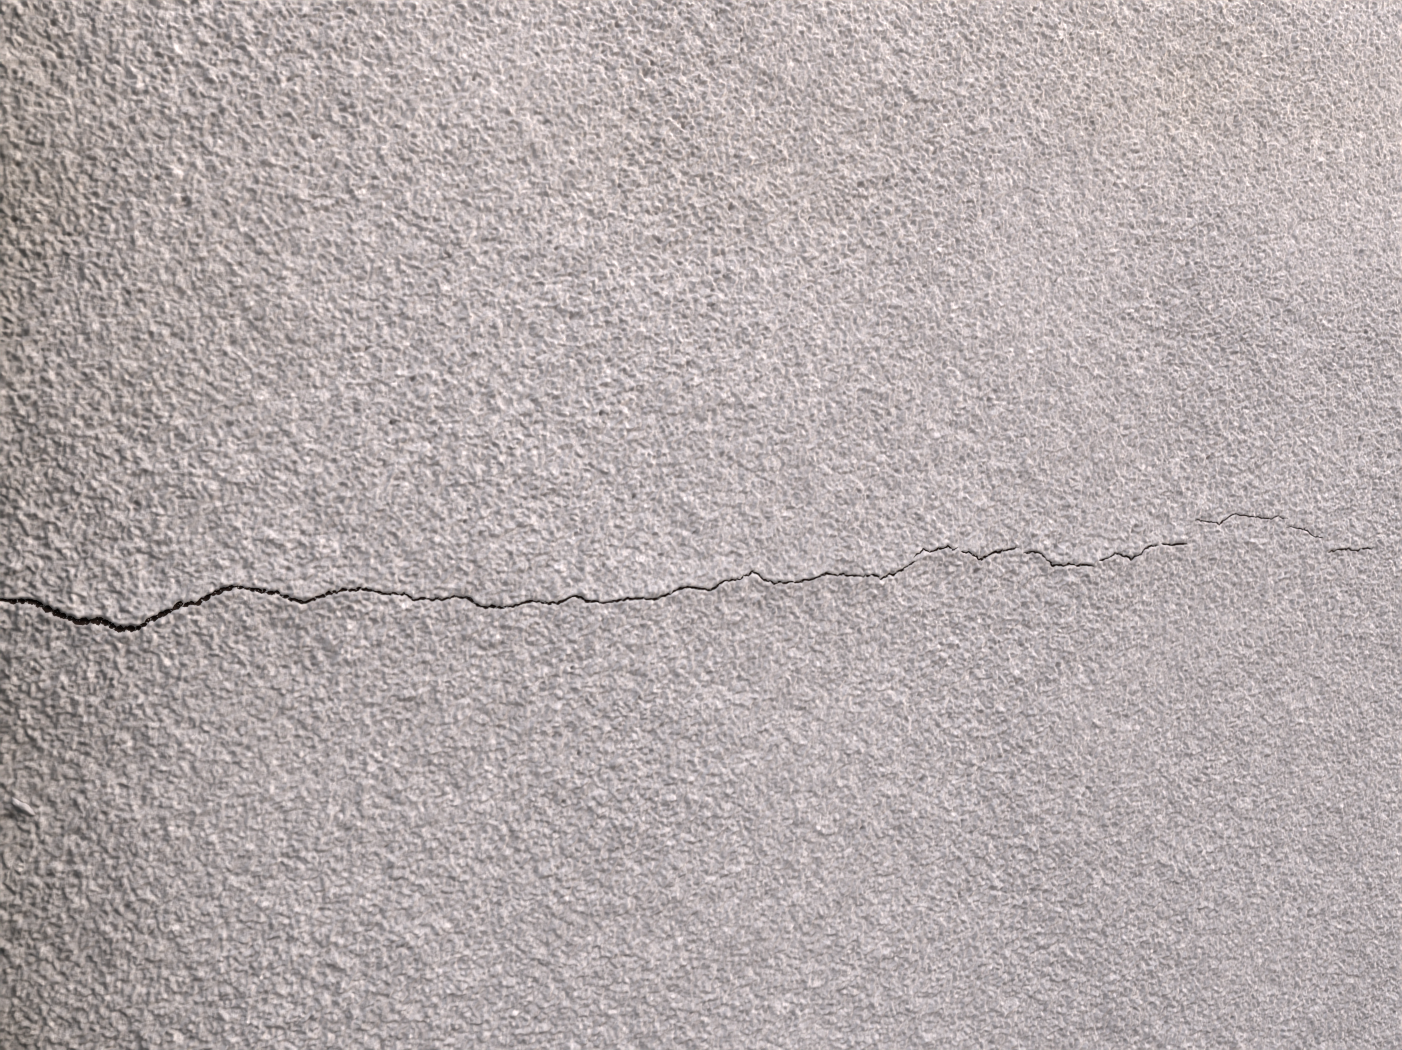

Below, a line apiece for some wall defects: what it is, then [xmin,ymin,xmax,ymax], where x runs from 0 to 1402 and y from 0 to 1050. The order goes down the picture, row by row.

crack [0,513,1373,633]